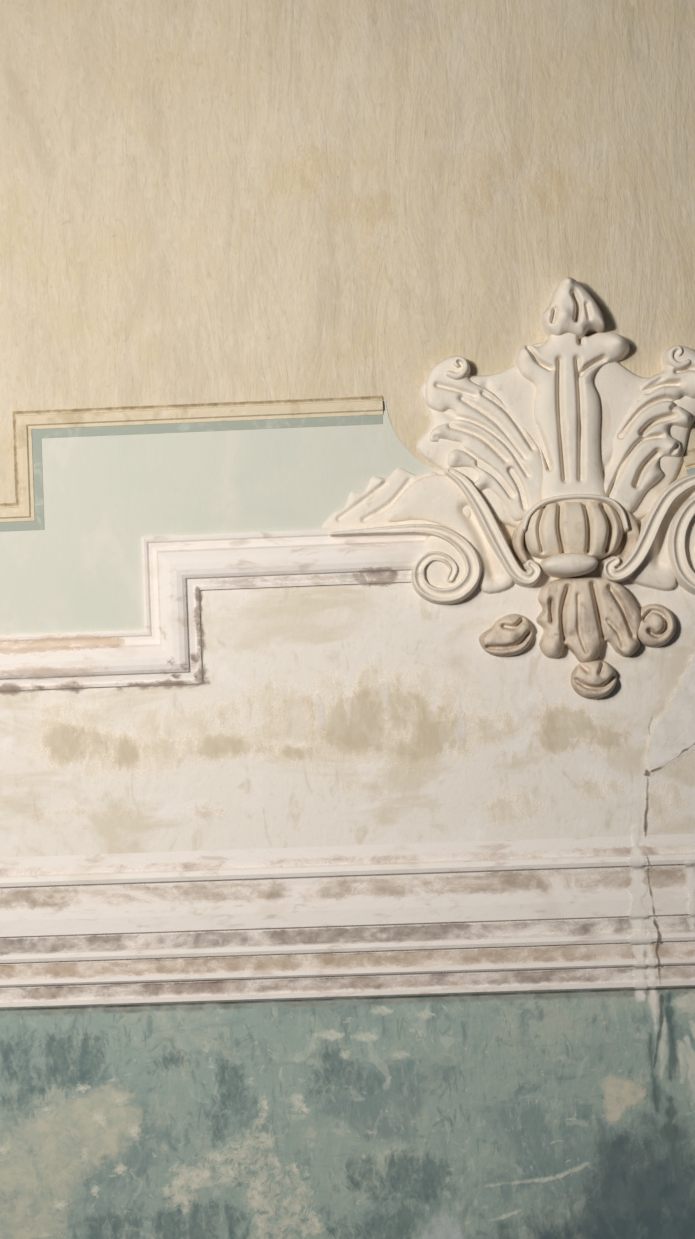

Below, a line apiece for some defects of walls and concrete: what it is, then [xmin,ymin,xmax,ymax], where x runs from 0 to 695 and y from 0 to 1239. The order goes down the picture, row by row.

crack [644,743,695,1068]